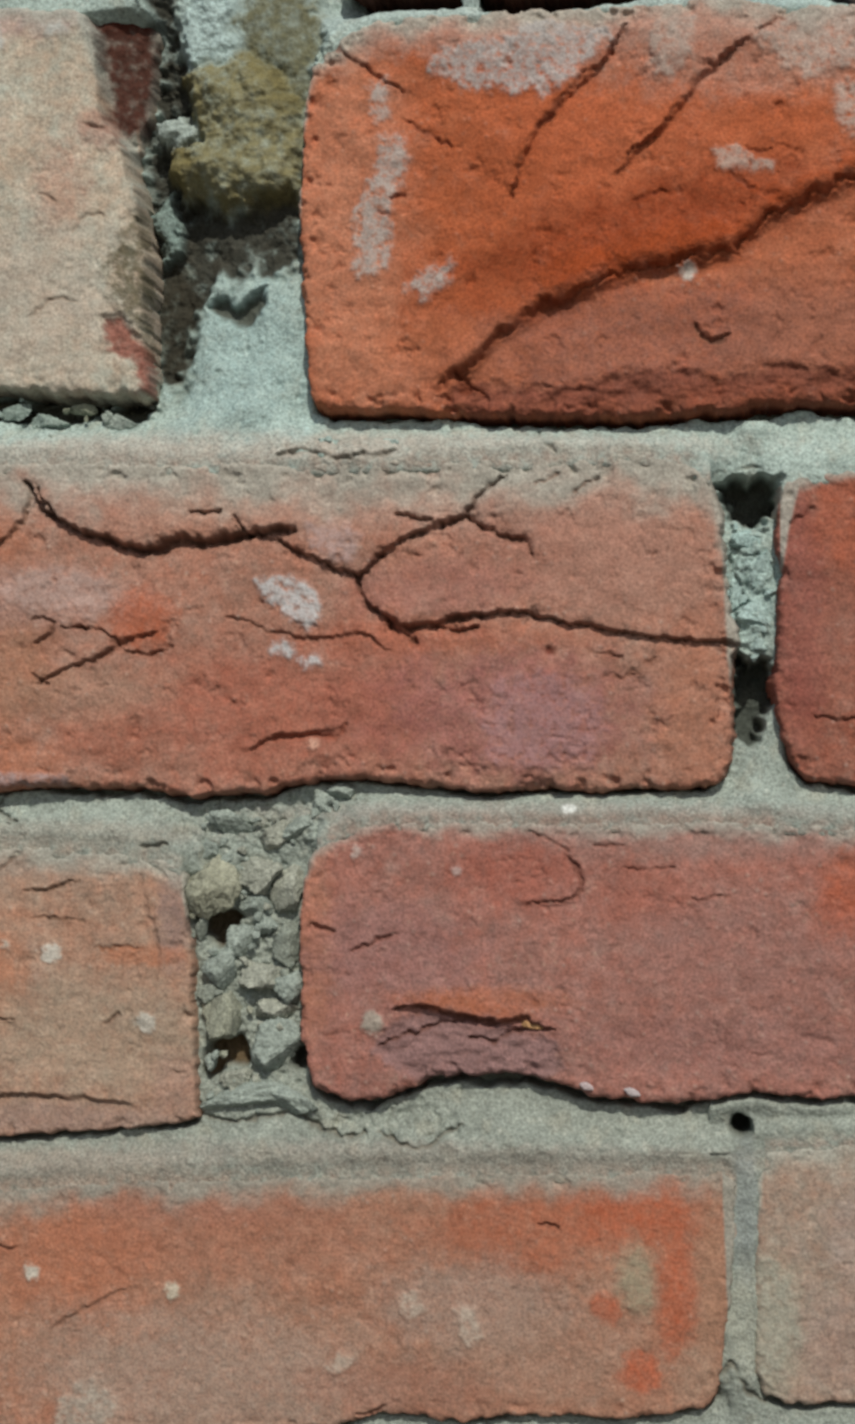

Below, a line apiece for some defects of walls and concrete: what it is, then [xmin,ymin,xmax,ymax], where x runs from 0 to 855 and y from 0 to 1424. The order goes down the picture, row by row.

crack [327,43,455,149]
crack [509,22,630,199]
crack [613,14,788,179]
crack [429,145,855,397]
crack [0,430,764,688]
spalling [710,471,786,749]
spalling [184,783,364,1115]
spalling [367,1008,594,1090]